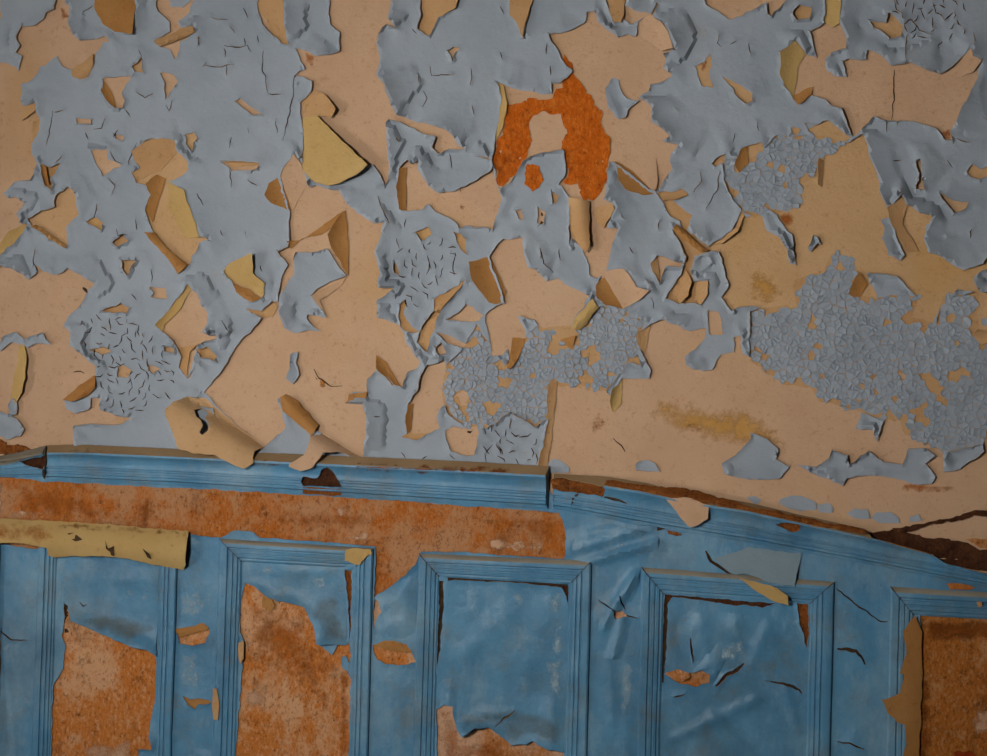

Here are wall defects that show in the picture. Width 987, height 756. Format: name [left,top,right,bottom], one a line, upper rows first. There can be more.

crack [75,287,174,412]
peeling [0,0,566,628]
crack [378,196,457,307]
crack [442,281,654,464]
peeling [396,0,987,369]
peeling [538,310,987,550]
crack [694,123,846,218]
crack [749,250,987,452]
peeling [51,603,156,756]
peeling [236,570,352,756]
peeling [436,705,564,756]
peeling [882,616,987,756]